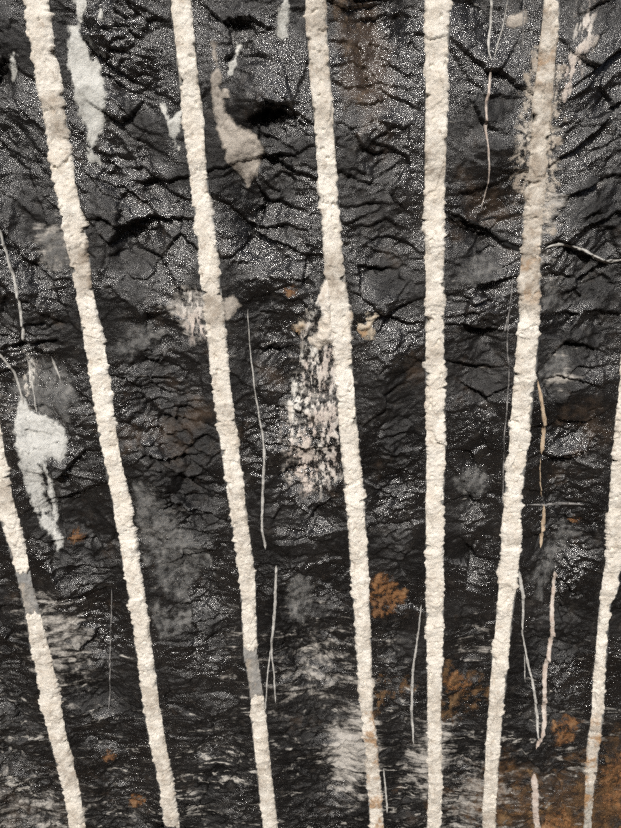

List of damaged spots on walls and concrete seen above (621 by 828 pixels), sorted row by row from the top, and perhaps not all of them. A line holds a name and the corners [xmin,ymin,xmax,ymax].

water stain [67,0,107,165]
water stain [160,103,182,150]
water stain [211,42,264,188]
water stain [510,46,539,194]
water stain [542,10,599,235]
water stain [175,288,206,340]
water stain [223,296,241,320]
water stain [13,357,68,550]
water stain [283,300,339,493]
corrosion [369,573,408,618]
corrosion [496,737,621,828]
corrosion [551,714,578,746]